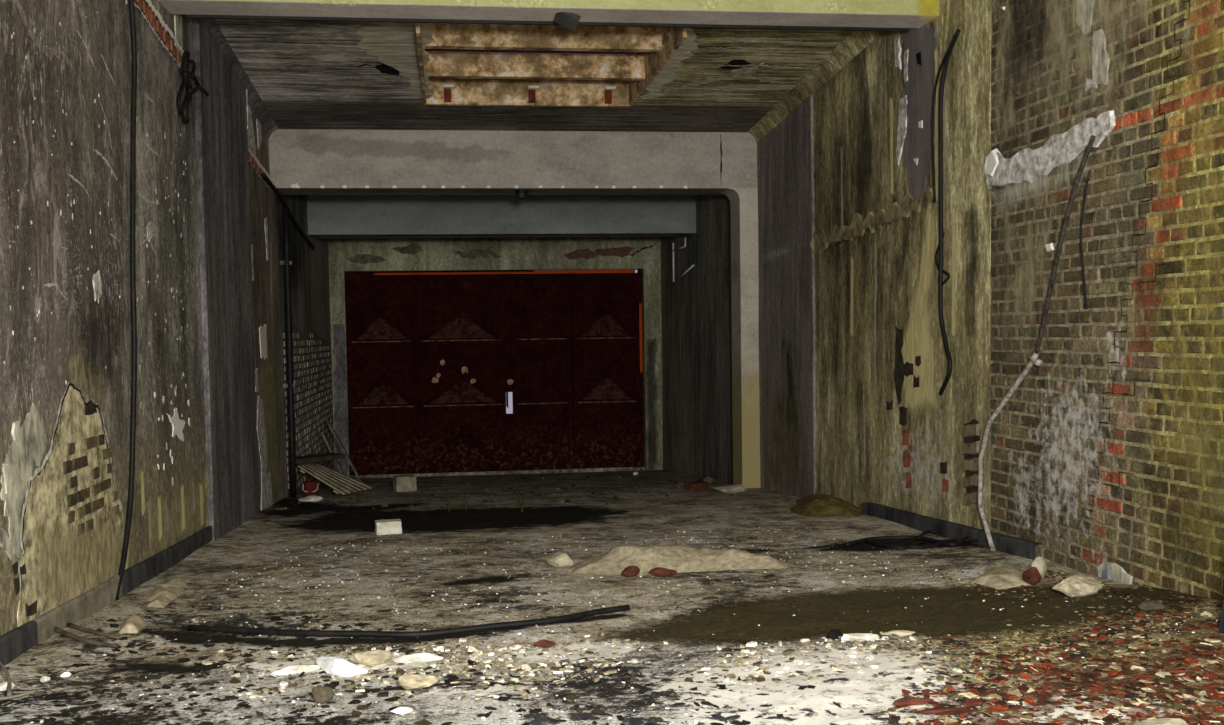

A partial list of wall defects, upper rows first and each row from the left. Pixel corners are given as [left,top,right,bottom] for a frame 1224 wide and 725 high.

peeling [1085,29,1110,91]
peeling [985,148,1001,176]
peeling [86,267,103,303]
leakage [1016,385,1103,526]
flaking render [0,348,129,627]